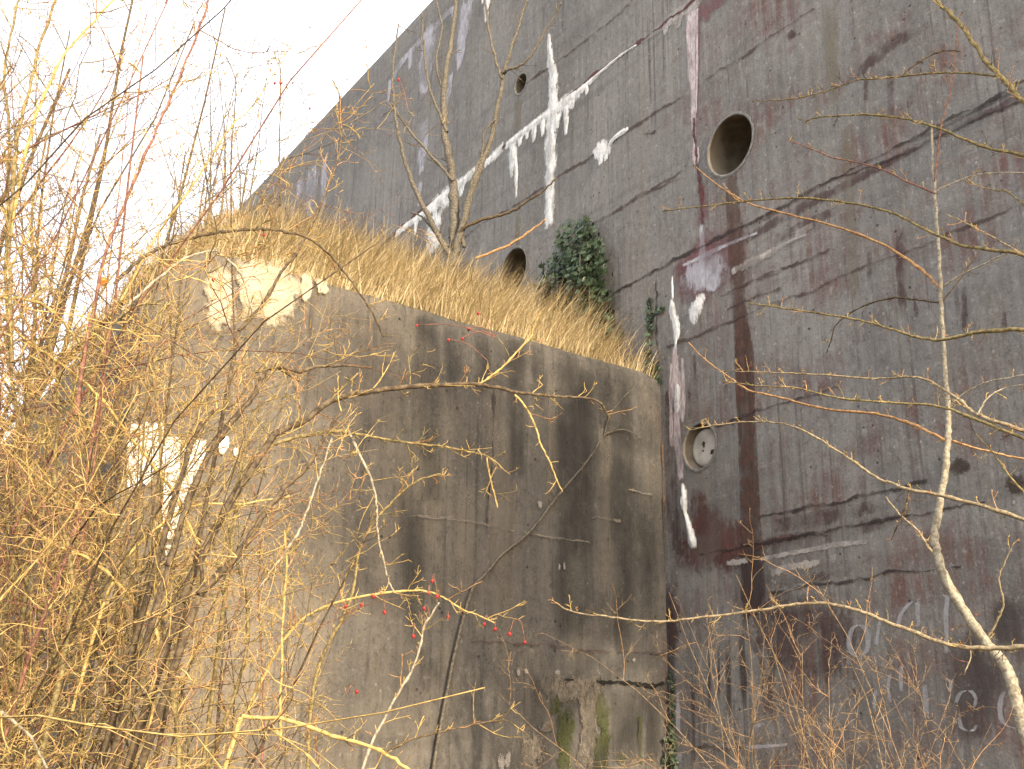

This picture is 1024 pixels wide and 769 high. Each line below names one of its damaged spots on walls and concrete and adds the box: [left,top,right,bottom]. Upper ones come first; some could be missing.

corrosion [853,147,915,182]
corrosion [673,174,856,680]
corrosion [666,597,679,645]
crack [566,678,664,688]
spalling [546,669,603,769]